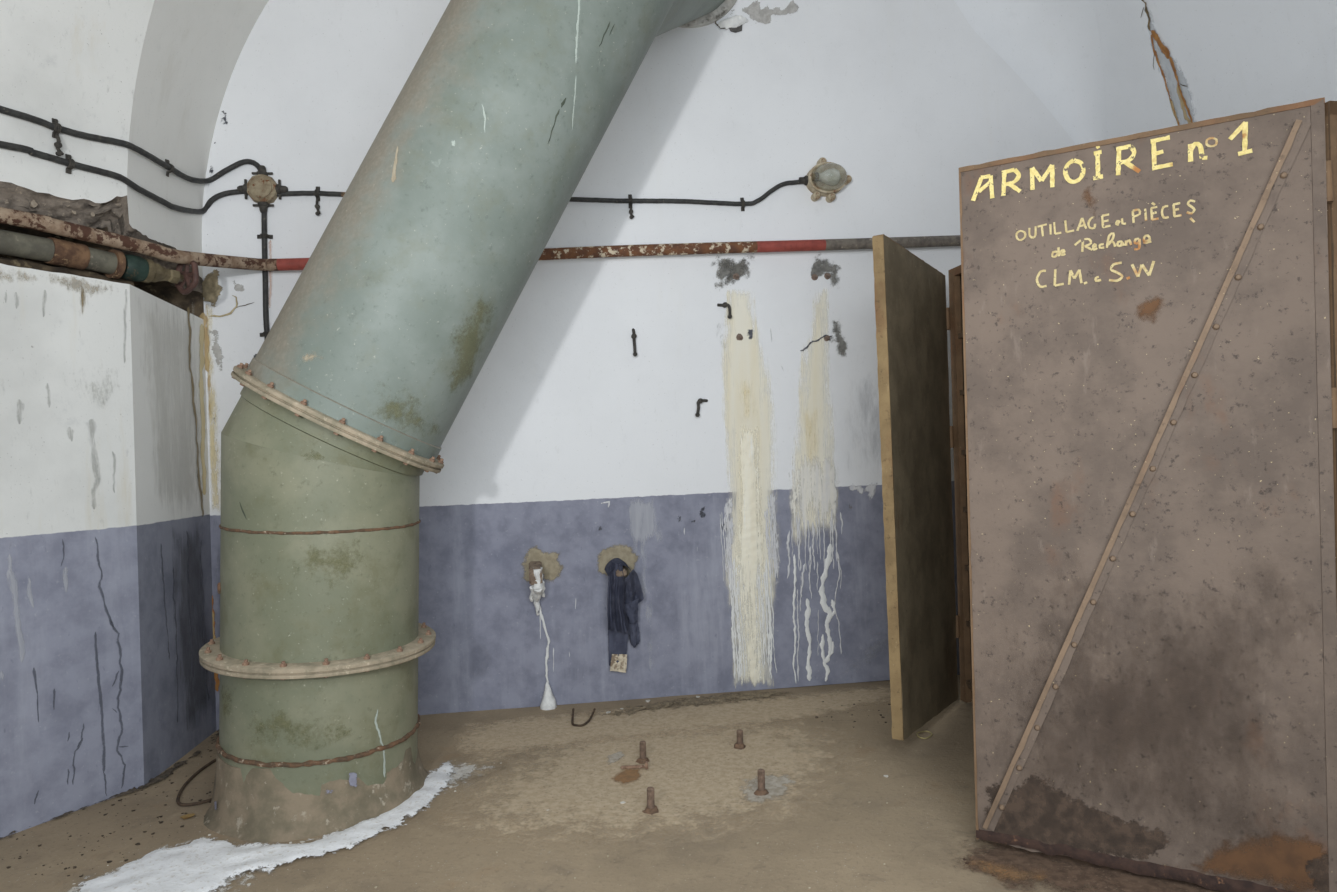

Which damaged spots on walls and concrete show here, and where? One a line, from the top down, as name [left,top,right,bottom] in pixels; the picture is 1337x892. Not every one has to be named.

peeling [715,0,799,33]
crack [1141,0,1194,125]
damp [447,254,891,842]
crack [34,537,128,804]
rust [612,768,641,783]